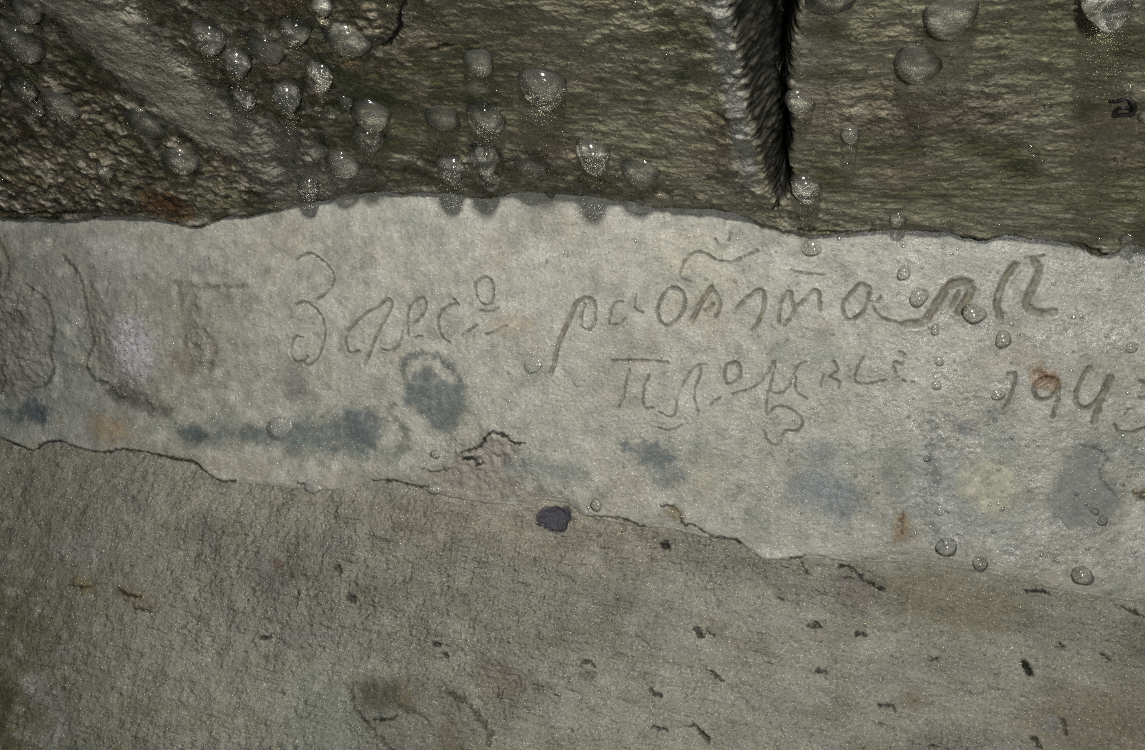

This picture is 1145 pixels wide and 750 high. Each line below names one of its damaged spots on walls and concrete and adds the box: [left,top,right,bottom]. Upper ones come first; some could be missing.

crack [711,0,800,208]
crack [797,226,870,234]
crack [951,232,985,241]
water stain [109,317,172,416]
water stain [179,411,377,456]
water stain [387,352,466,454]
water stain [1050,445,1118,527]